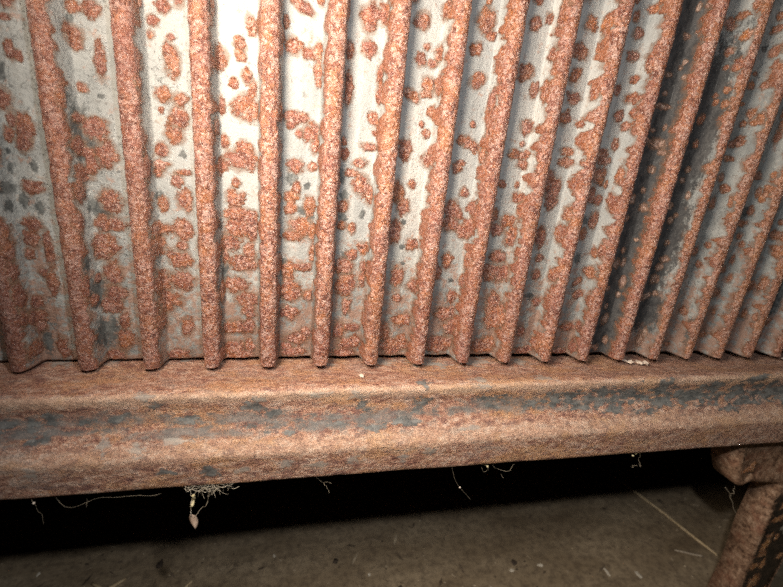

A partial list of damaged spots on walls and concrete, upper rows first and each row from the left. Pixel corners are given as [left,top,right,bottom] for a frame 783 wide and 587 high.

rust [745,503,783,587]